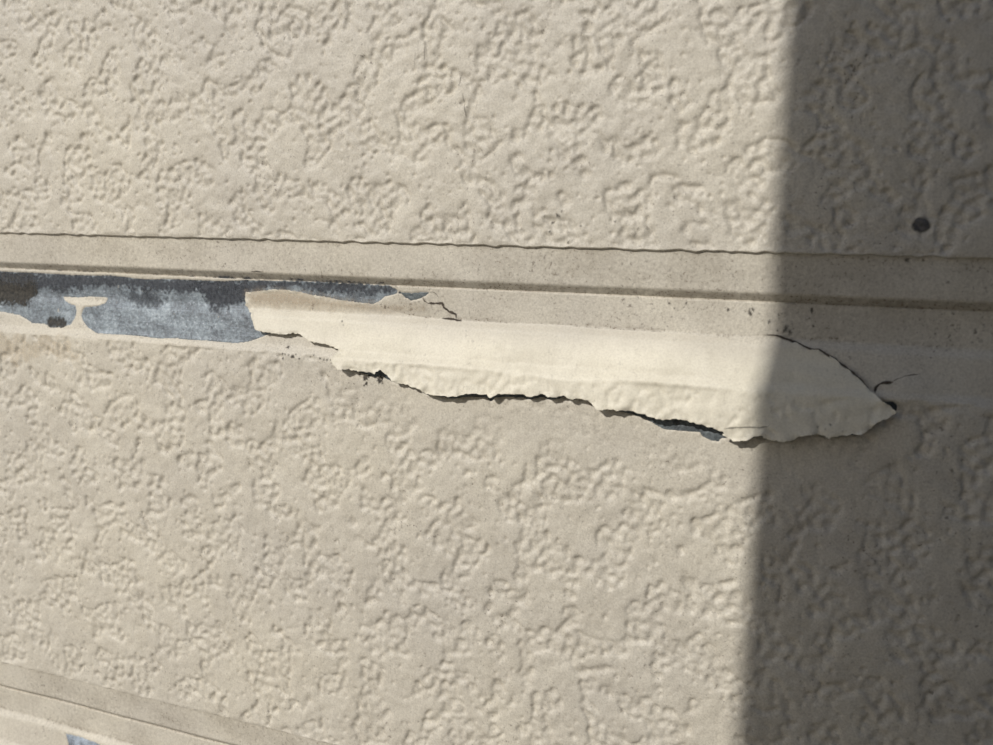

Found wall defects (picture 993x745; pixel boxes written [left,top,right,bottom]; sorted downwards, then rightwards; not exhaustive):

peeling [0,269,897,442]
peeling [66,734,100,745]